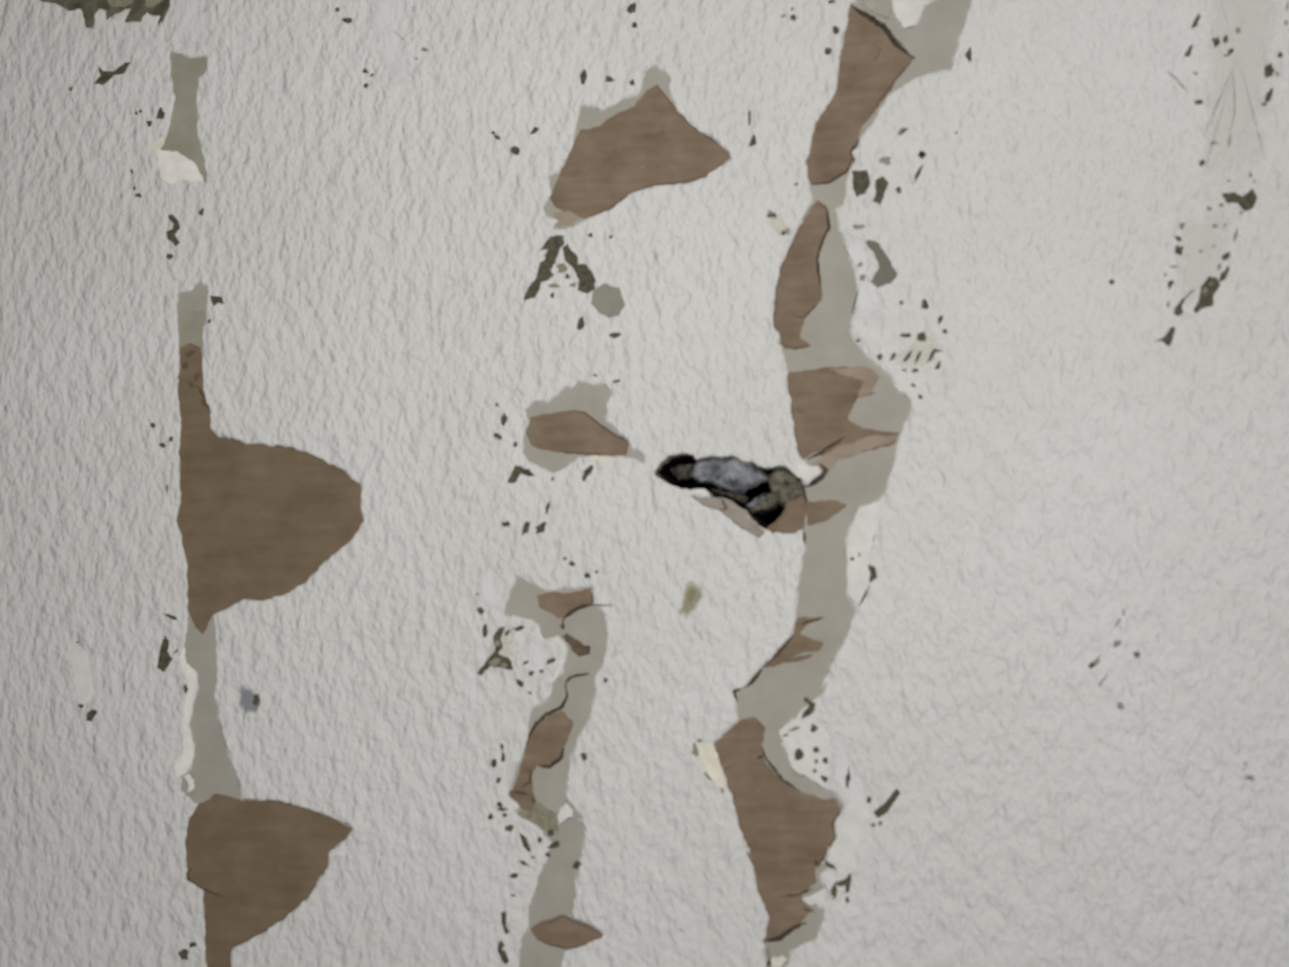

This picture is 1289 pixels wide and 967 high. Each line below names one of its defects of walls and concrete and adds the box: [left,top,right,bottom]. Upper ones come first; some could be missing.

peeling [41,0,207,184]
peeling [166,214,180,260]
peeling [491,131,520,155]
peeling [523,67,730,338]
peeling [502,502,550,536]
peeling [493,374,645,483]
peeling [658,0,972,967]
peeling [157,283,364,967]
peeling [476,557,613,967]